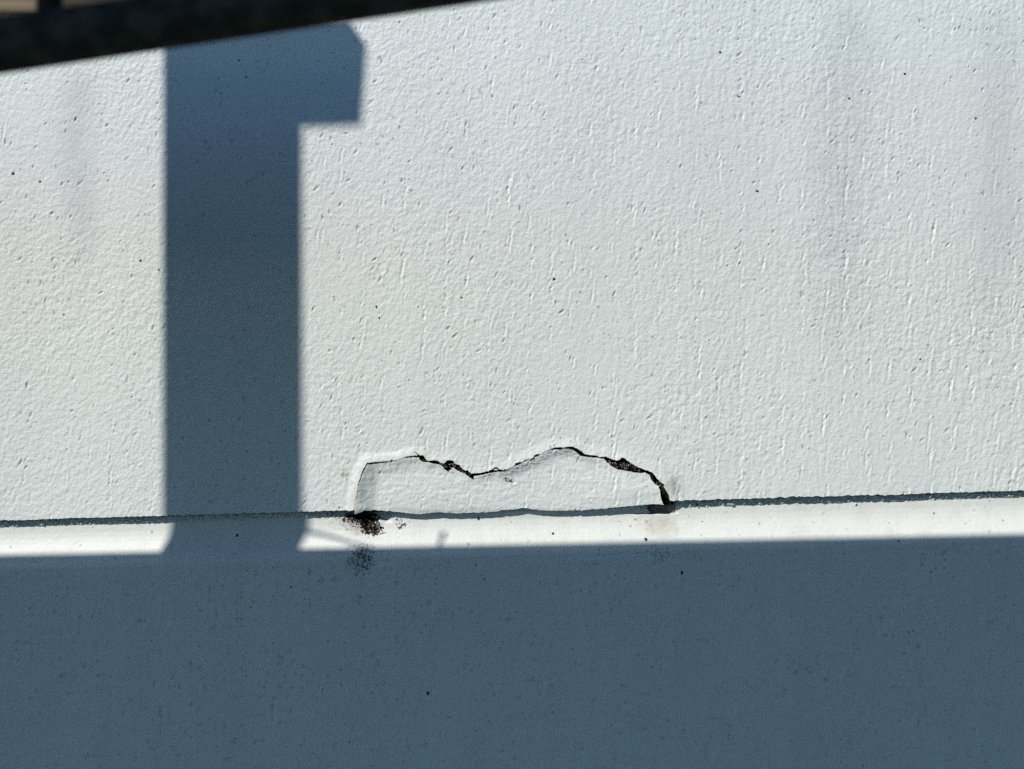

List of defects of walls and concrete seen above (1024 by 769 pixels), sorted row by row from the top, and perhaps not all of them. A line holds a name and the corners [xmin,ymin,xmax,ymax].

crack [352,446,674,509]